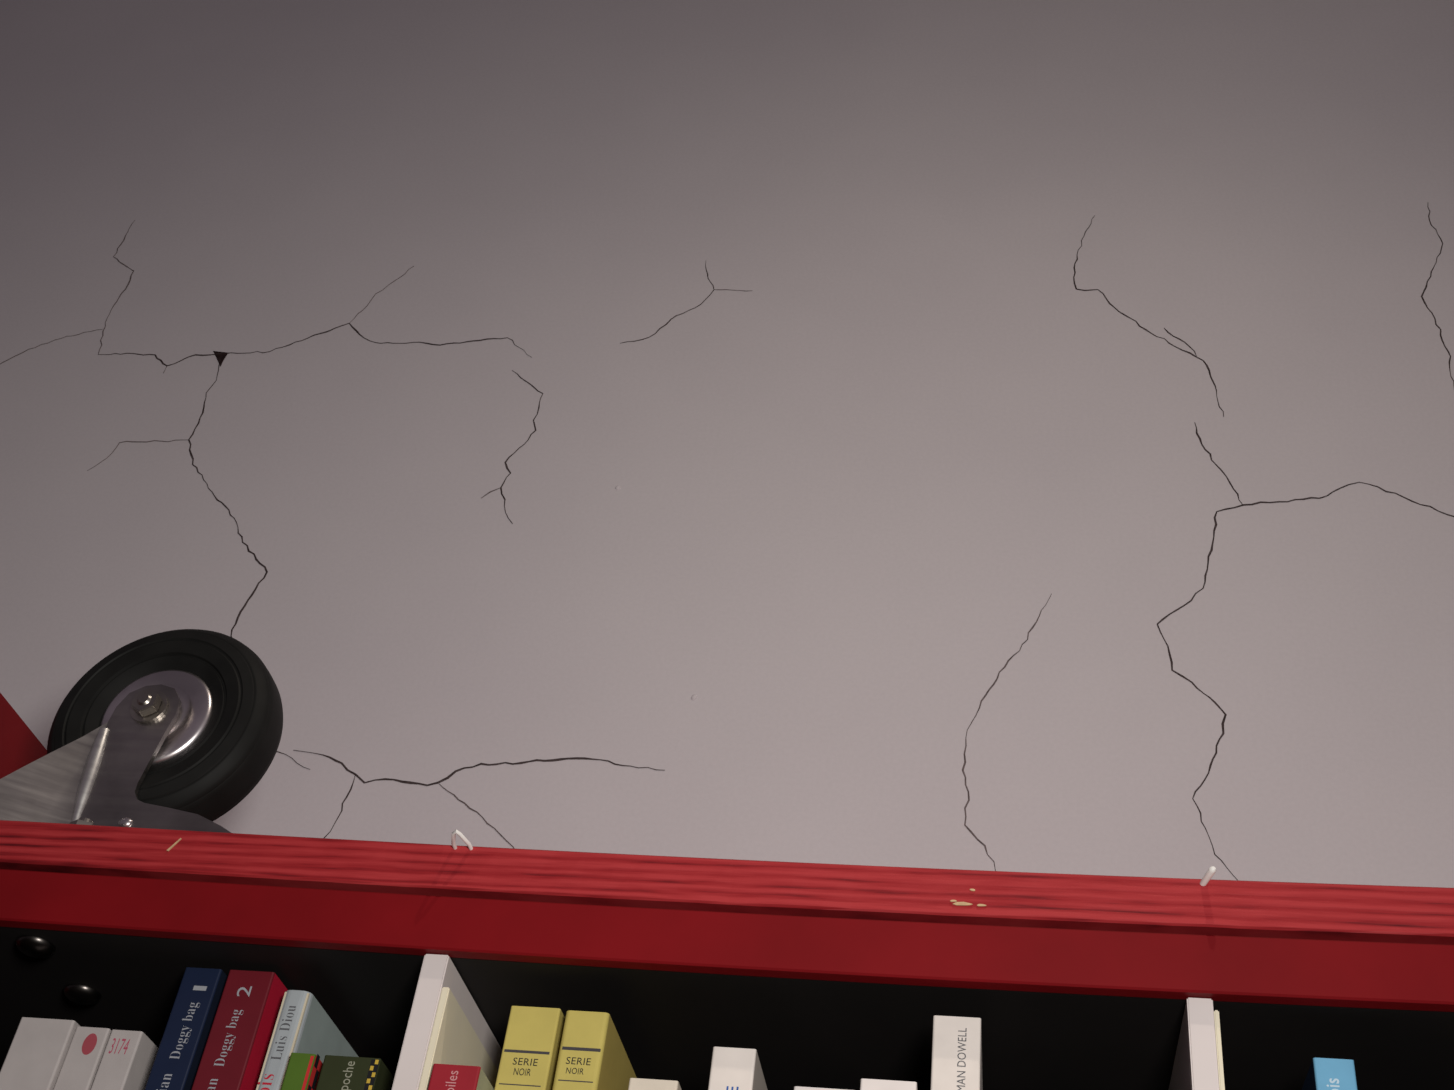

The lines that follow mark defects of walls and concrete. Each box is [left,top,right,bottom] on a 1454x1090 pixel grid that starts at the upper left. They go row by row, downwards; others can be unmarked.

crack [0,220,543,637]
crack [622,263,752,343]
crack [1073,206,1454,880]
crack [277,750,659,848]
crack [962,593,1052,871]